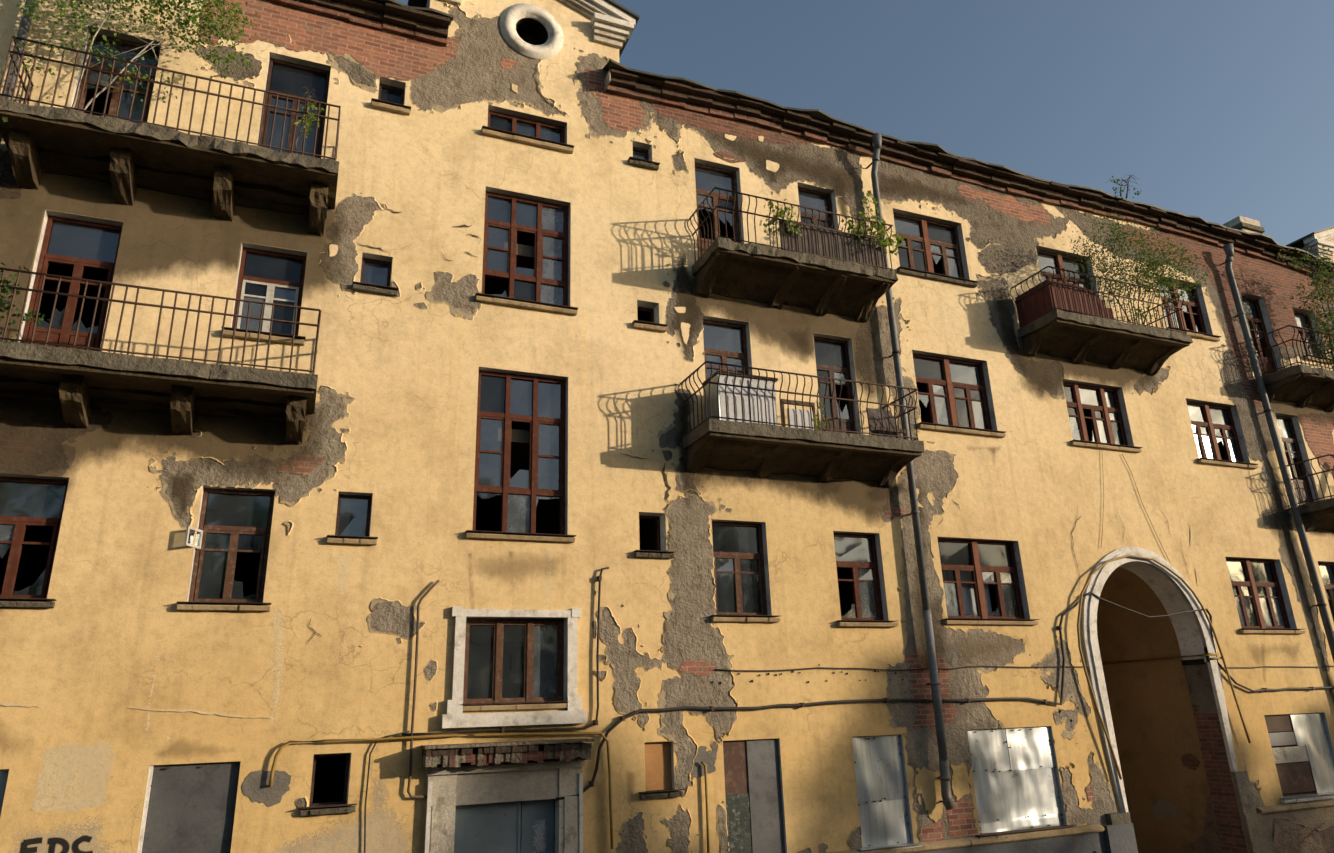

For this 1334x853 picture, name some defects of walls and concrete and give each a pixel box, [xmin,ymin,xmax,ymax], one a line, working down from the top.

peeling [147,385,357,536]
peeling [242,770,309,811]
peeling [423,658,438,681]
peeling [590,381,739,853]
flaking render [195,0,1334,672]
peeling [860,296,1119,843]